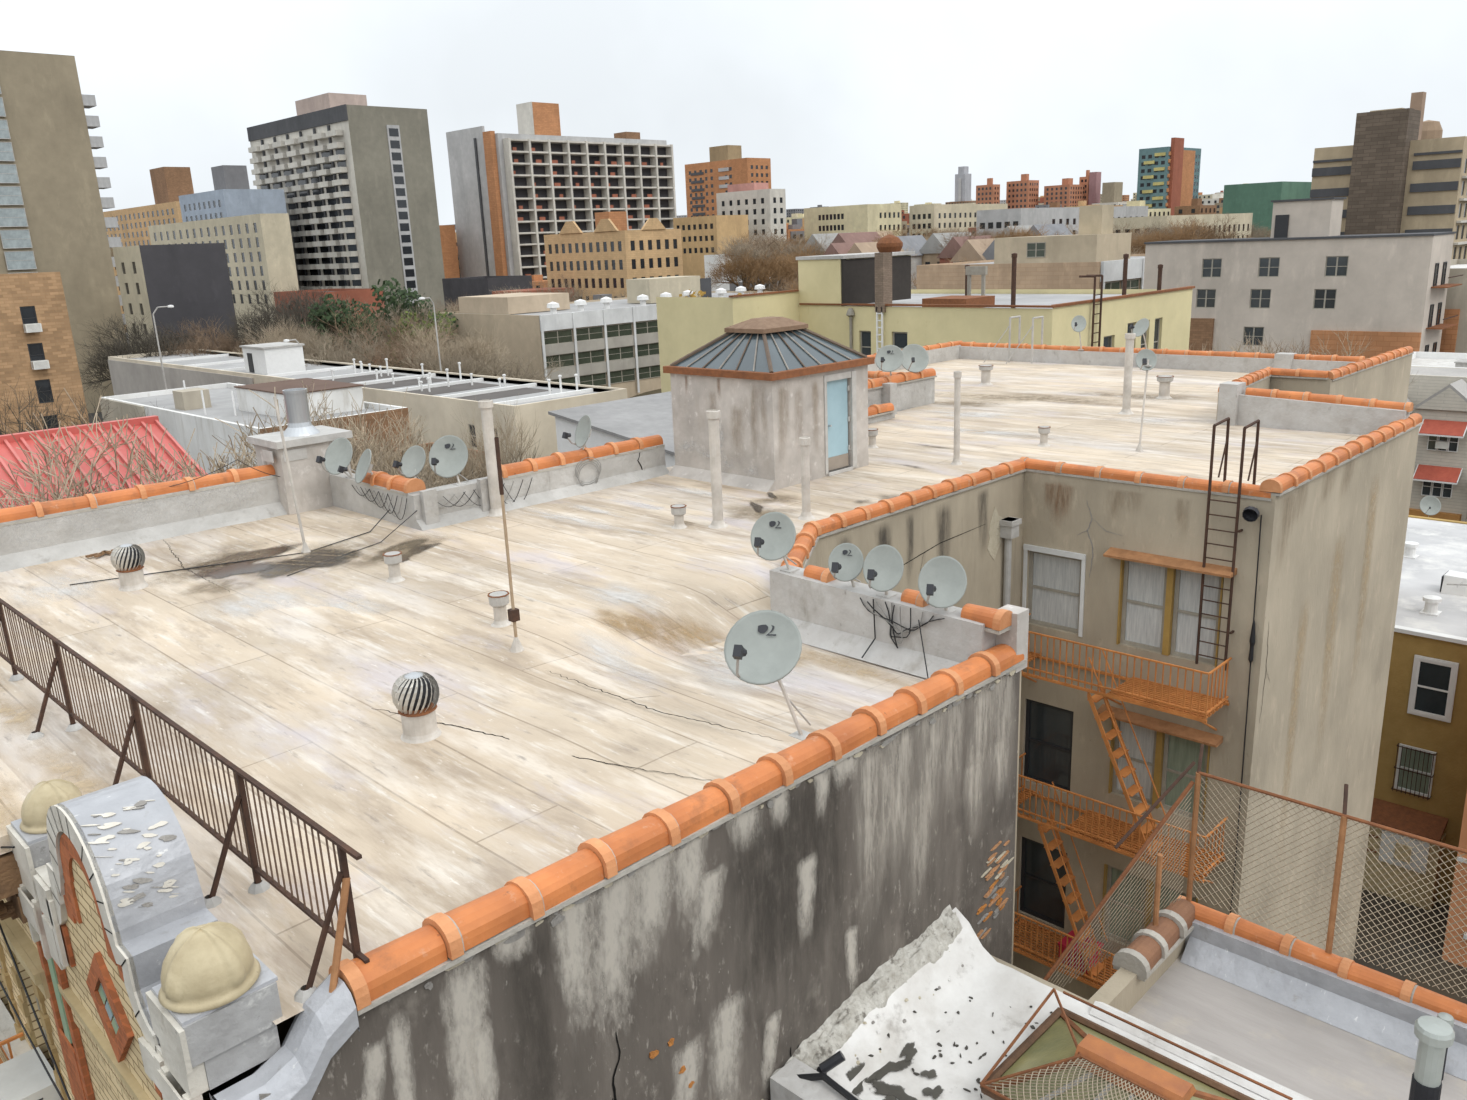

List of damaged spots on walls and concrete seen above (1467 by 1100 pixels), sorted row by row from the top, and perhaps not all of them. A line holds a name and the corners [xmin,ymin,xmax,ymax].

peeling [81,800,180,907]
water stain [497,930,529,956]
water stain [557,838,720,1011]
water stain [847,929,856,978]
water stain [733,676,1012,963]
spalling [977,840,1014,939]
water stain [365,1022,413,1100]
water stain [445,970,496,1100]
crack [612,1032,621,1100]
water stain [677,1044,698,1100]
water stain [715,997,743,1089]
water stain [763,1016,777,1079]